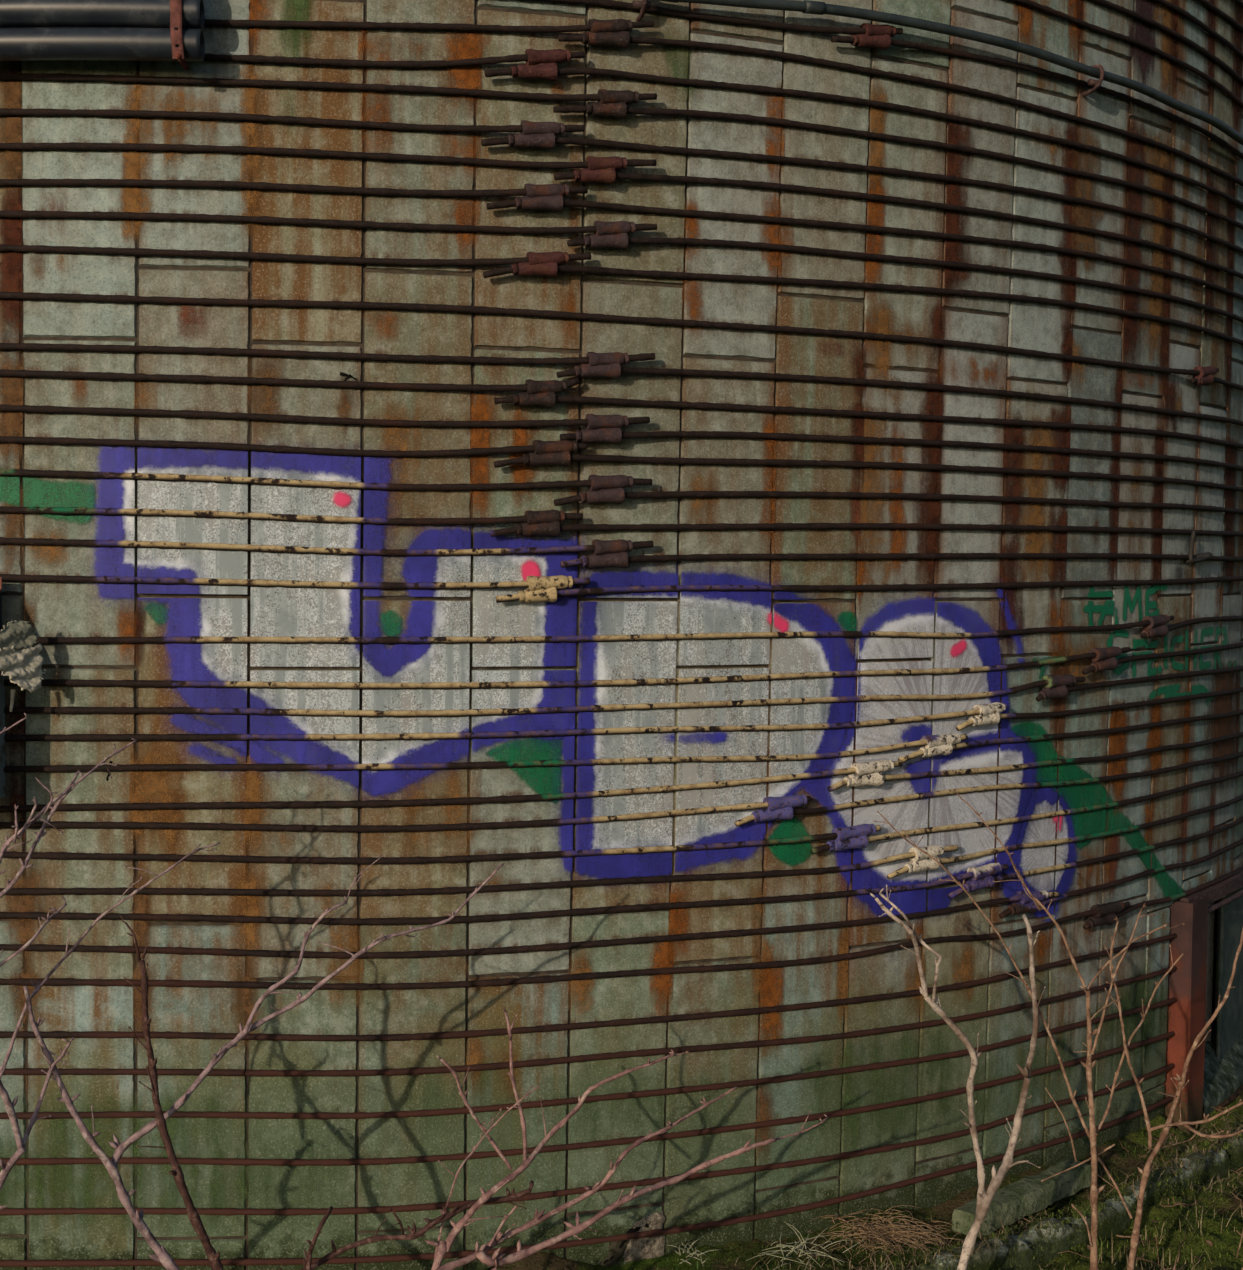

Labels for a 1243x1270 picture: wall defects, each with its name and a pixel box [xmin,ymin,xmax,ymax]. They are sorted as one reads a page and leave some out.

rust [0,66,43,343]
rust [240,65,260,216]
rust [446,31,484,100]
rust [1129,0,1185,90]
rust [0,360,24,456]
rust [824,88,974,605]
rust [1095,124,1182,587]
rust [1217,436,1243,615]
rust [129,746,180,848]
rust [231,867,264,1041]
rust [650,884,688,1013]
rust [752,940,783,1054]